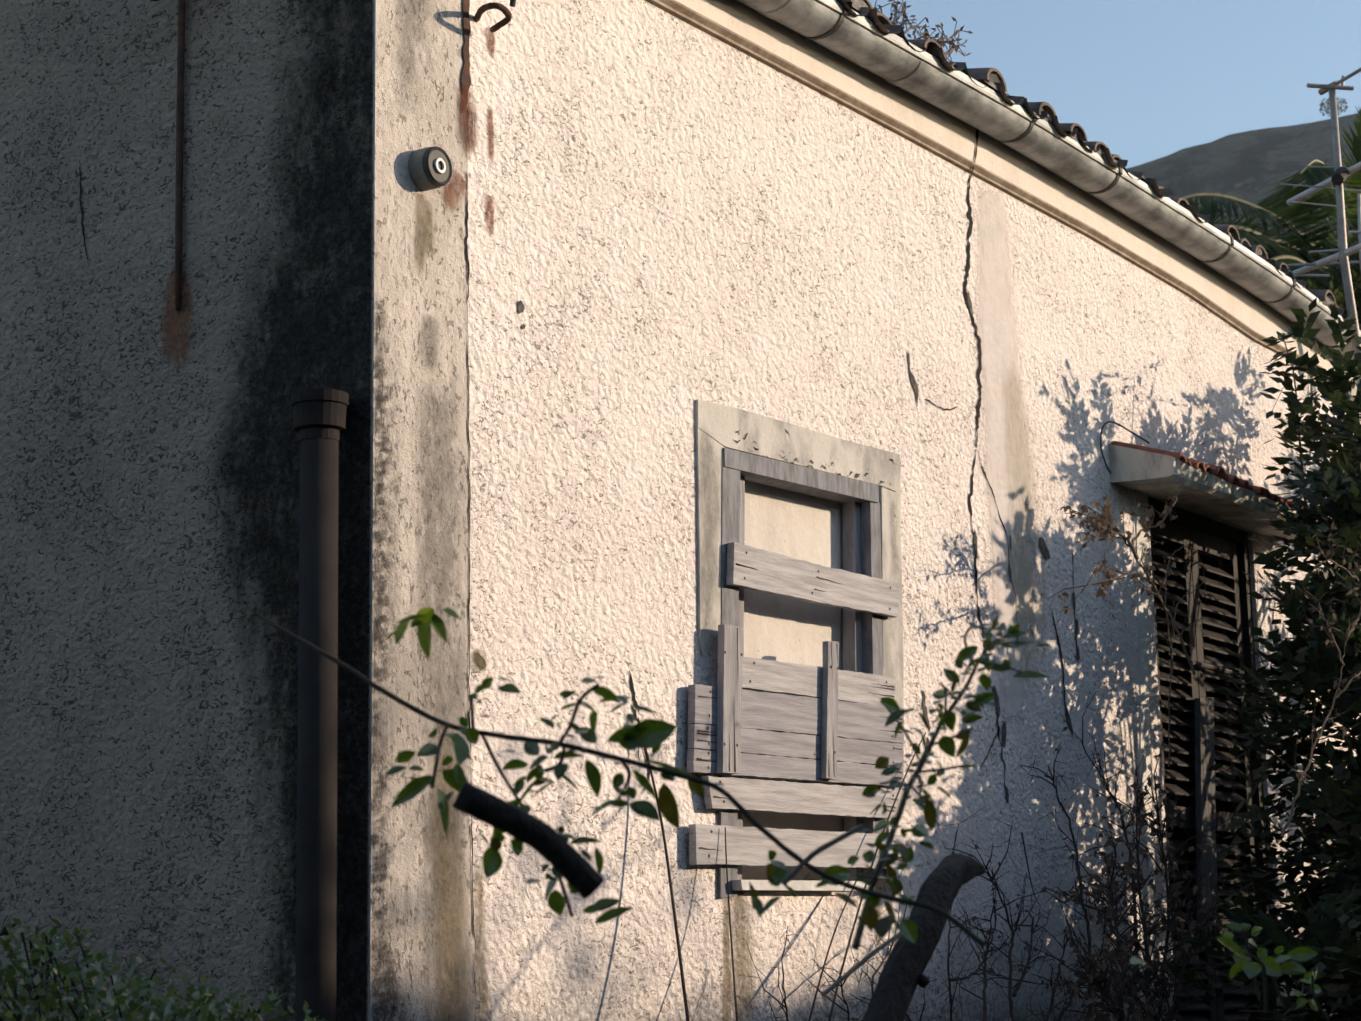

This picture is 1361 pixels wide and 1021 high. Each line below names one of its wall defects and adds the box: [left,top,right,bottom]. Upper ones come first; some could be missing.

corrosion [460,0,495,157]
water stain [417,193,433,265]
water stain [218,0,405,1021]
crack [907,129,1019,804]
crack [1051,549,1080,736]